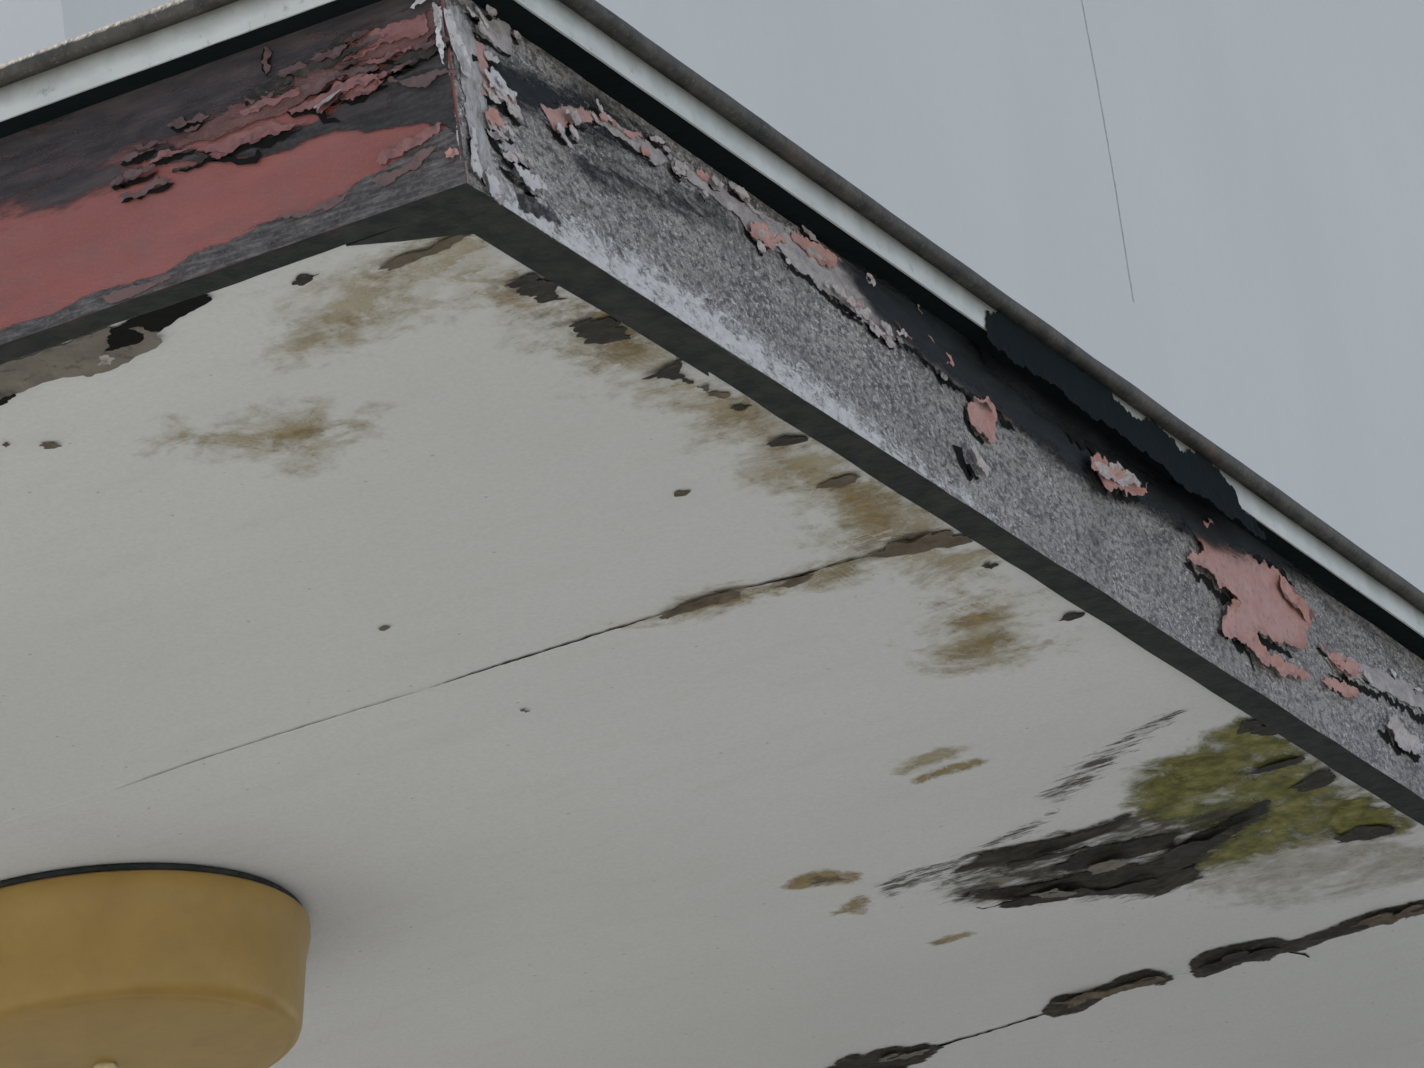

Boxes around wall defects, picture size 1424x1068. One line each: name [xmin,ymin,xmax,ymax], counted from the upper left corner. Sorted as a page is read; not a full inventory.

peeling [0,0,553,345]
leakage [288,276,410,352]
leakage [407,236,567,327]
peeling [540,98,1015,481]
peeling [0,326,163,401]
leakage [179,416,320,456]
peeling [1067,432,1147,504]
crack [115,555,870,790]
leakage [941,598,1025,673]
peeling [1176,518,1424,763]